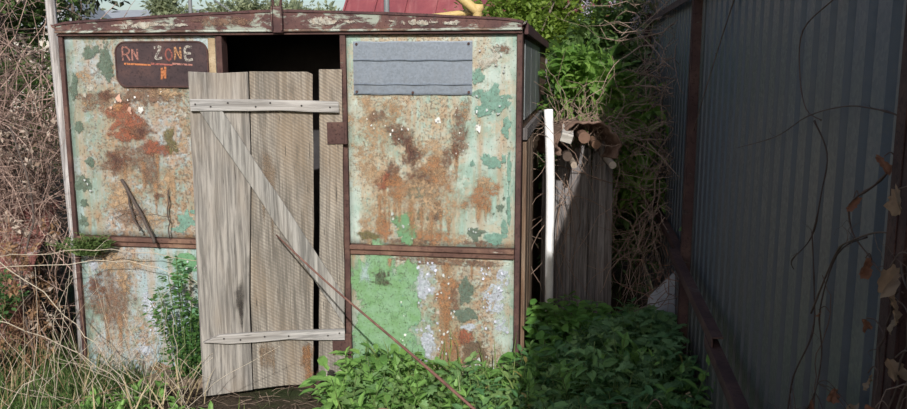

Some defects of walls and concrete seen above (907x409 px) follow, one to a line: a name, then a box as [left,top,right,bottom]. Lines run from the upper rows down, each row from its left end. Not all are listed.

peeling [309,16,354,25]
rust [75,88,189,229]
rust [348,94,500,247]
peeling [351,238,510,371]
rust [388,256,497,369]